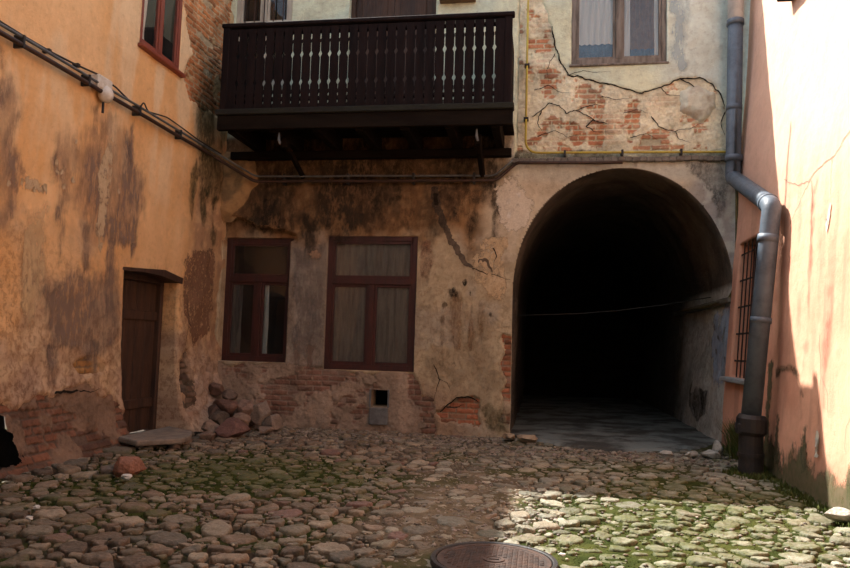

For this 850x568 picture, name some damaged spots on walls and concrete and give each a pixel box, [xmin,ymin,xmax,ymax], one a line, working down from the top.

flaking render [183,0,234,115]
flaking render [517,0,726,153]
crack [532,30,726,142]
damp [4,129,22,216]
damp [22,127,142,379]
crack [430,186,510,280]
crack [784,131,850,256]
flaking render [0,354,132,479]
flaking render [218,362,481,434]